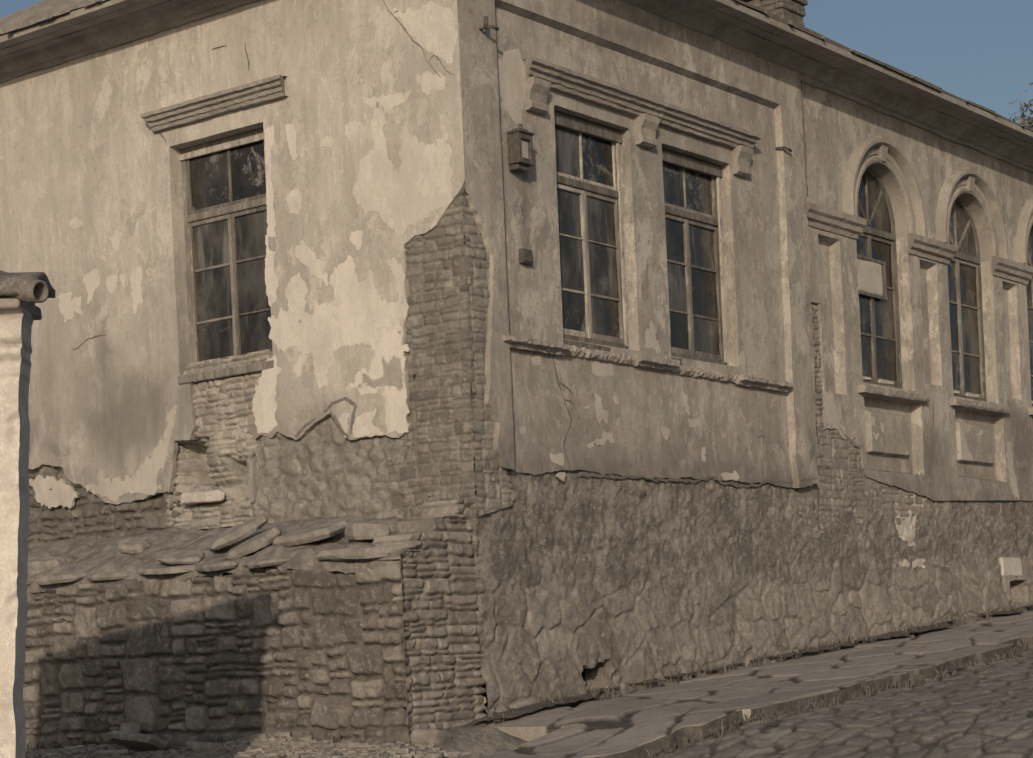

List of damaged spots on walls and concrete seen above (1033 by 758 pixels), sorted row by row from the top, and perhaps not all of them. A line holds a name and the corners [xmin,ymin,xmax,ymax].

crack [383,0,453,78]
flaking render [498,48,525,124]
flaking render [28,1,515,555]
crack [553,358,822,537]
flaking render [790,303,922,542]